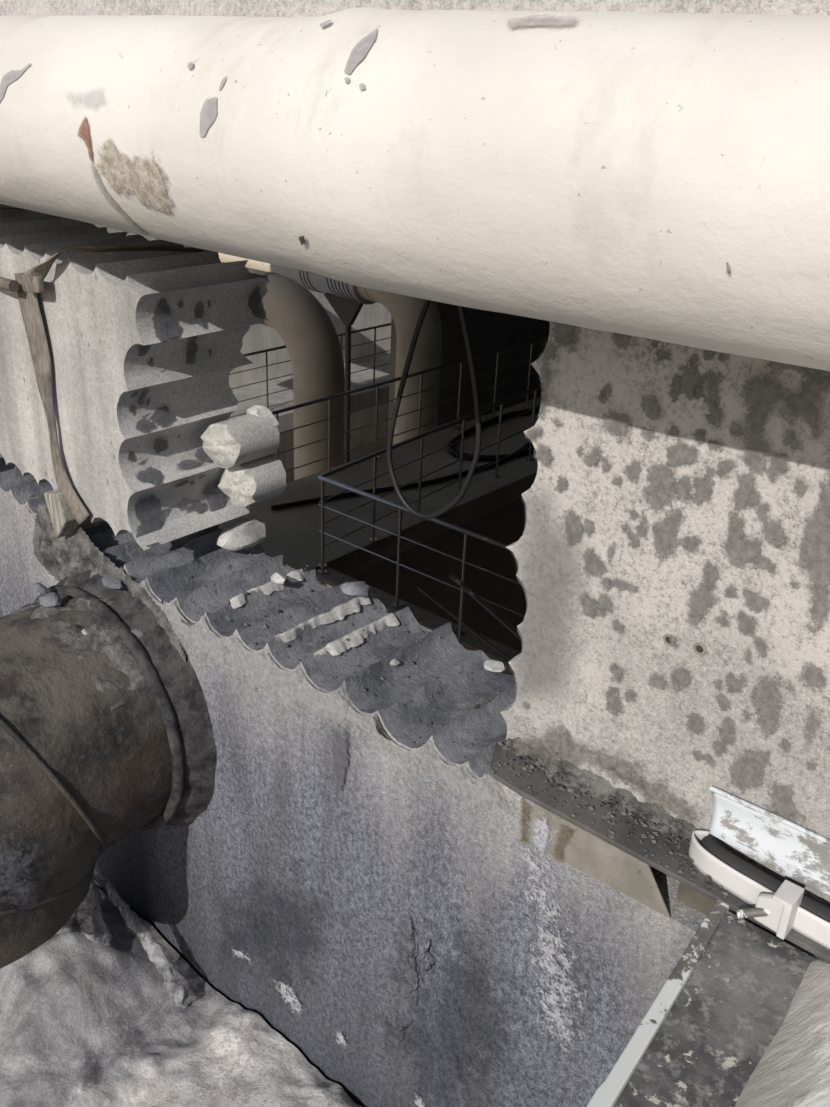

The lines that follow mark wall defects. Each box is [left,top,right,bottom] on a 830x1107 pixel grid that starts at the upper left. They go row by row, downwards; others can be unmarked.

peeling [200,77,226,137]
peeling [344,28,378,90]
water stain [576,338,830,574]
spalling [228,569,305,609]
spalling [274,595,371,642]
water stain [139,581,512,809]
spalling [313,613,400,657]
water stain [518,509,637,687]
water stain [686,561,830,821]
water stain [791,468,830,633]
crack [399,913,435,1054]
water stain [522,803,596,1052]